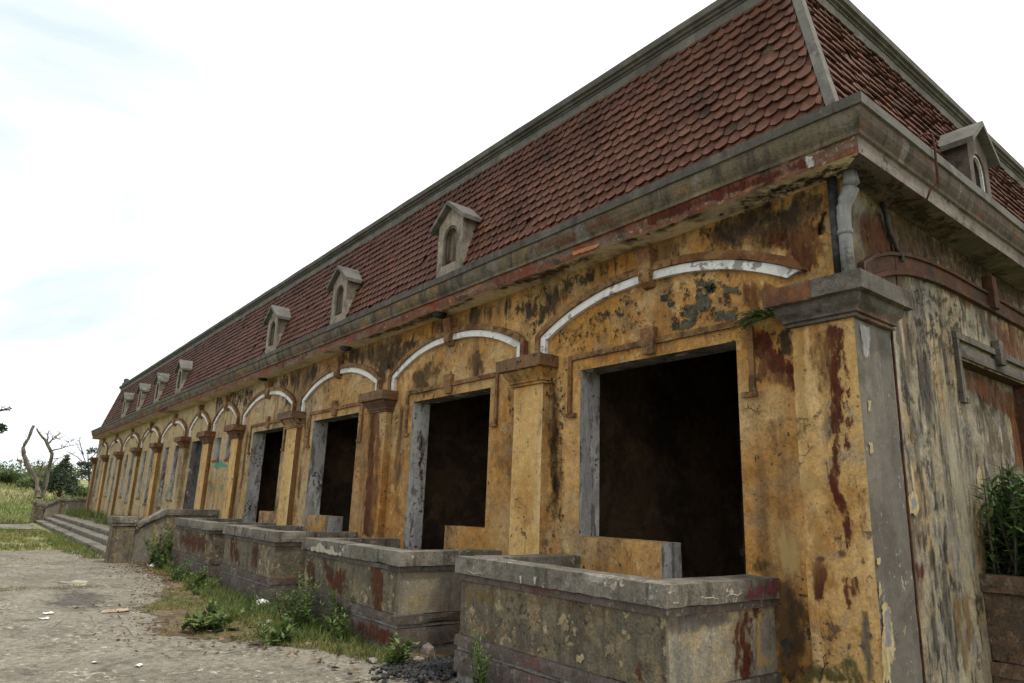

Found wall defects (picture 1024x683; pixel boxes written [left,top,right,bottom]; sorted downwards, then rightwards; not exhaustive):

leakage [625,156,1024,311]
spalling [660,278,739,331]
rust [753,329,794,390]
leakage [907,288,962,463]
leakage [551,373,565,531]
rust [810,324,853,551]
rust [358,567,393,647]
rust [731,608,763,680]
rust [812,563,827,601]
rust [842,577,859,610]
peeling [879,582,896,683]
leakage [922,475,972,669]